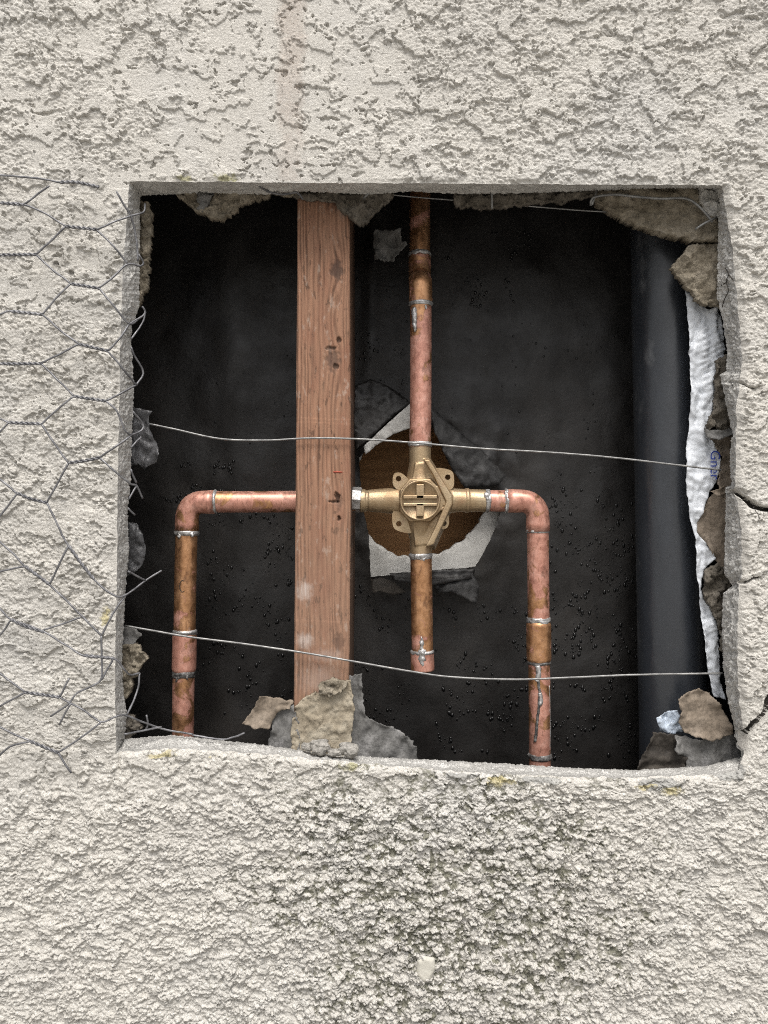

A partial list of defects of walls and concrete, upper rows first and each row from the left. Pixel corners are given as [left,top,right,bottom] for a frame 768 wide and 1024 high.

spalling [139,200,155,307]
spalling [177,191,394,227]
spalling [453,188,721,309]
spalling [705,354,733,436]
crack [735,493,768,519]
spalling [702,563,732,653]
spalling [122,642,149,699]
spalling [125,713,144,739]
spalling [290,677,355,756]